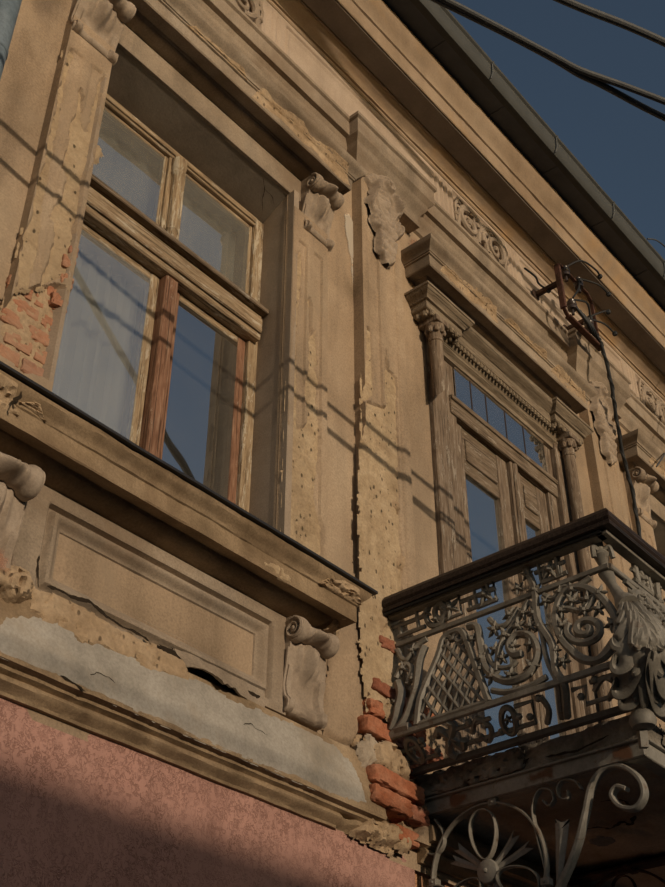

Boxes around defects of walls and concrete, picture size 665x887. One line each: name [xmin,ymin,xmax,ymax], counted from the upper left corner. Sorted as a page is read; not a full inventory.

flaking render [0,50,104,376]
flaking render [0,373,47,422]
flaking render [280,334,321,555]
flaking render [0,553,189,680]
flaking render [264,562,292,586]
flaking render [320,330,444,857]